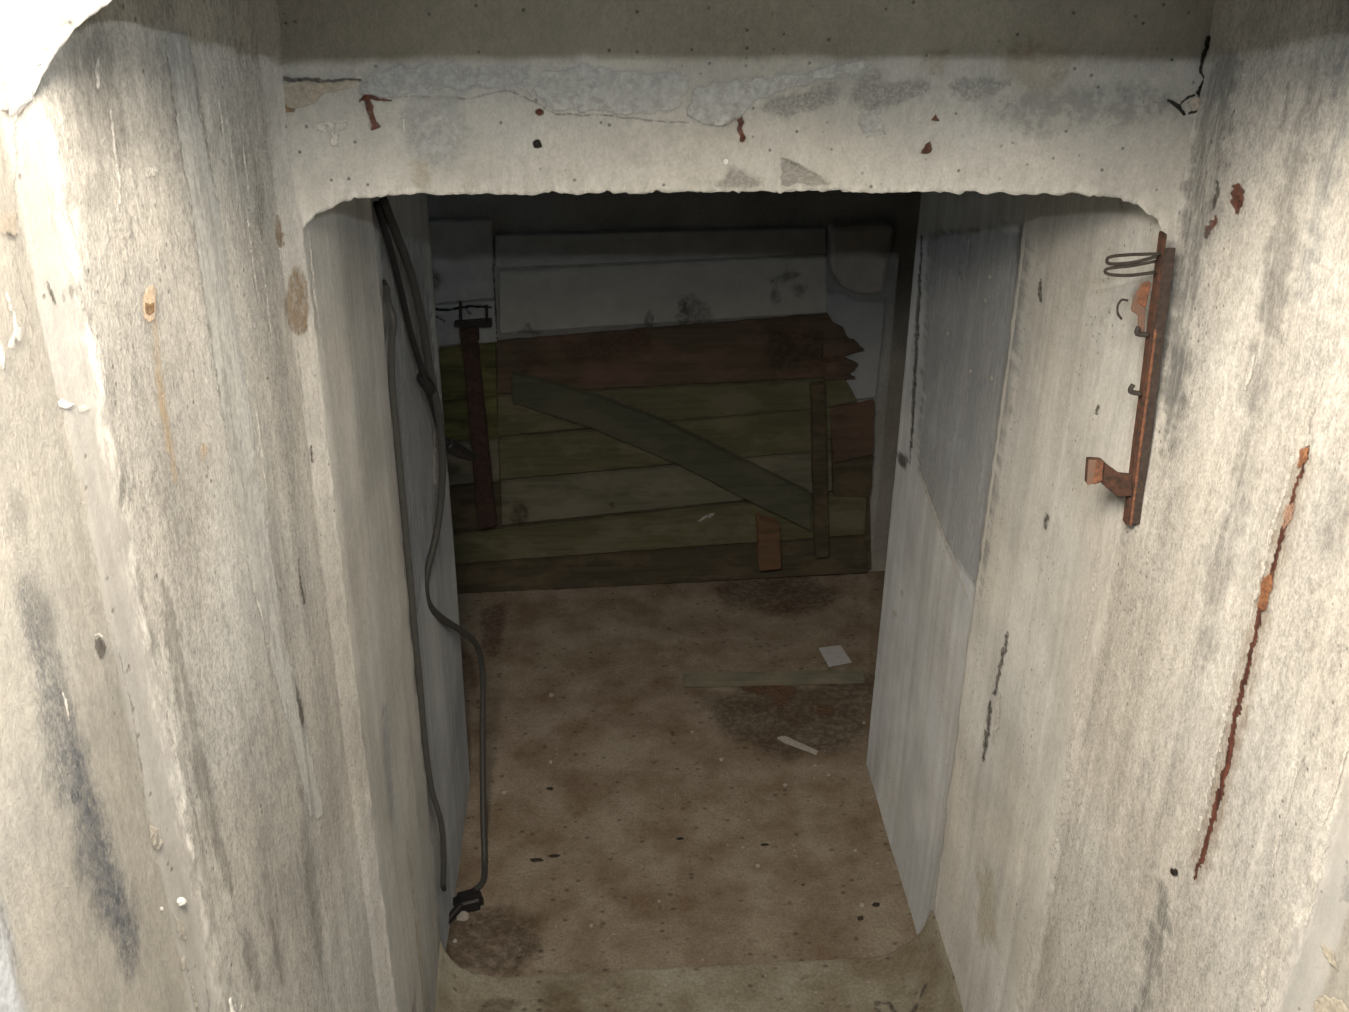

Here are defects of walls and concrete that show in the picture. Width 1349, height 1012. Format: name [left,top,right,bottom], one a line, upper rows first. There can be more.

corrosion [359,94,392,131]
crack [1167,36,1211,116]
corrosion [1084,231,1176,526]
leakage [22,590,137,968]